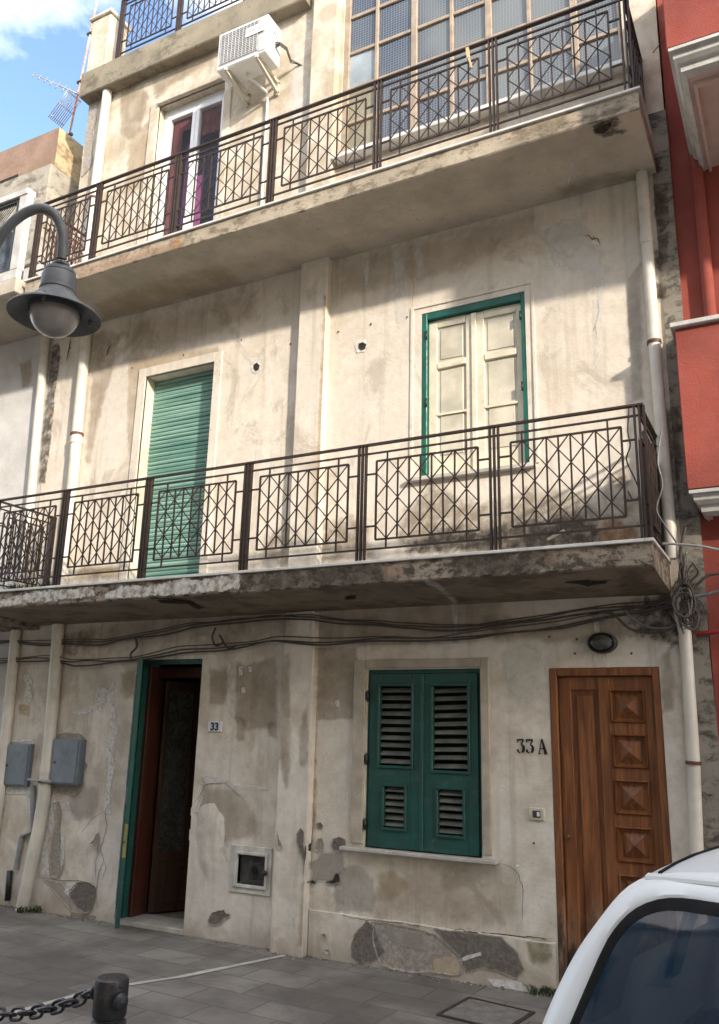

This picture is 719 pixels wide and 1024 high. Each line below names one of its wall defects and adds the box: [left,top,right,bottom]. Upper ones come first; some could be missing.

damp [654,185,669,270]
damp [656,284,667,299]
damp [39,345,60,483]
damp [410,518,633,574]
damp [0,565,382,607]
spalling [39,794,95,914]
spalling [296,822,346,885]
spalling [208,910,230,926]
spalling [351,921,529,992]